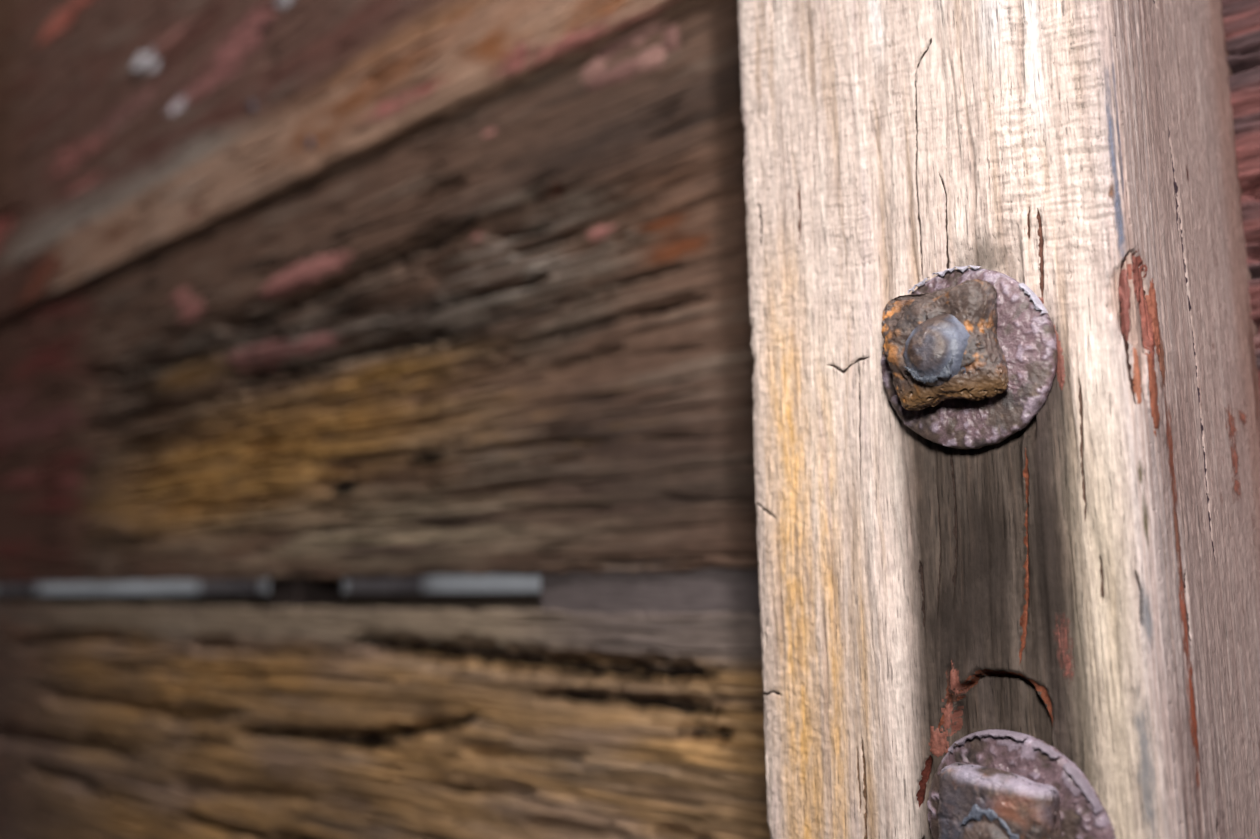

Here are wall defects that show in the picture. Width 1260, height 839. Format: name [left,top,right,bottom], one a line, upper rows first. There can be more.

crack [1168,128,1216,563]
crack [856,740,867,839]
crack [916,448,1053,839]